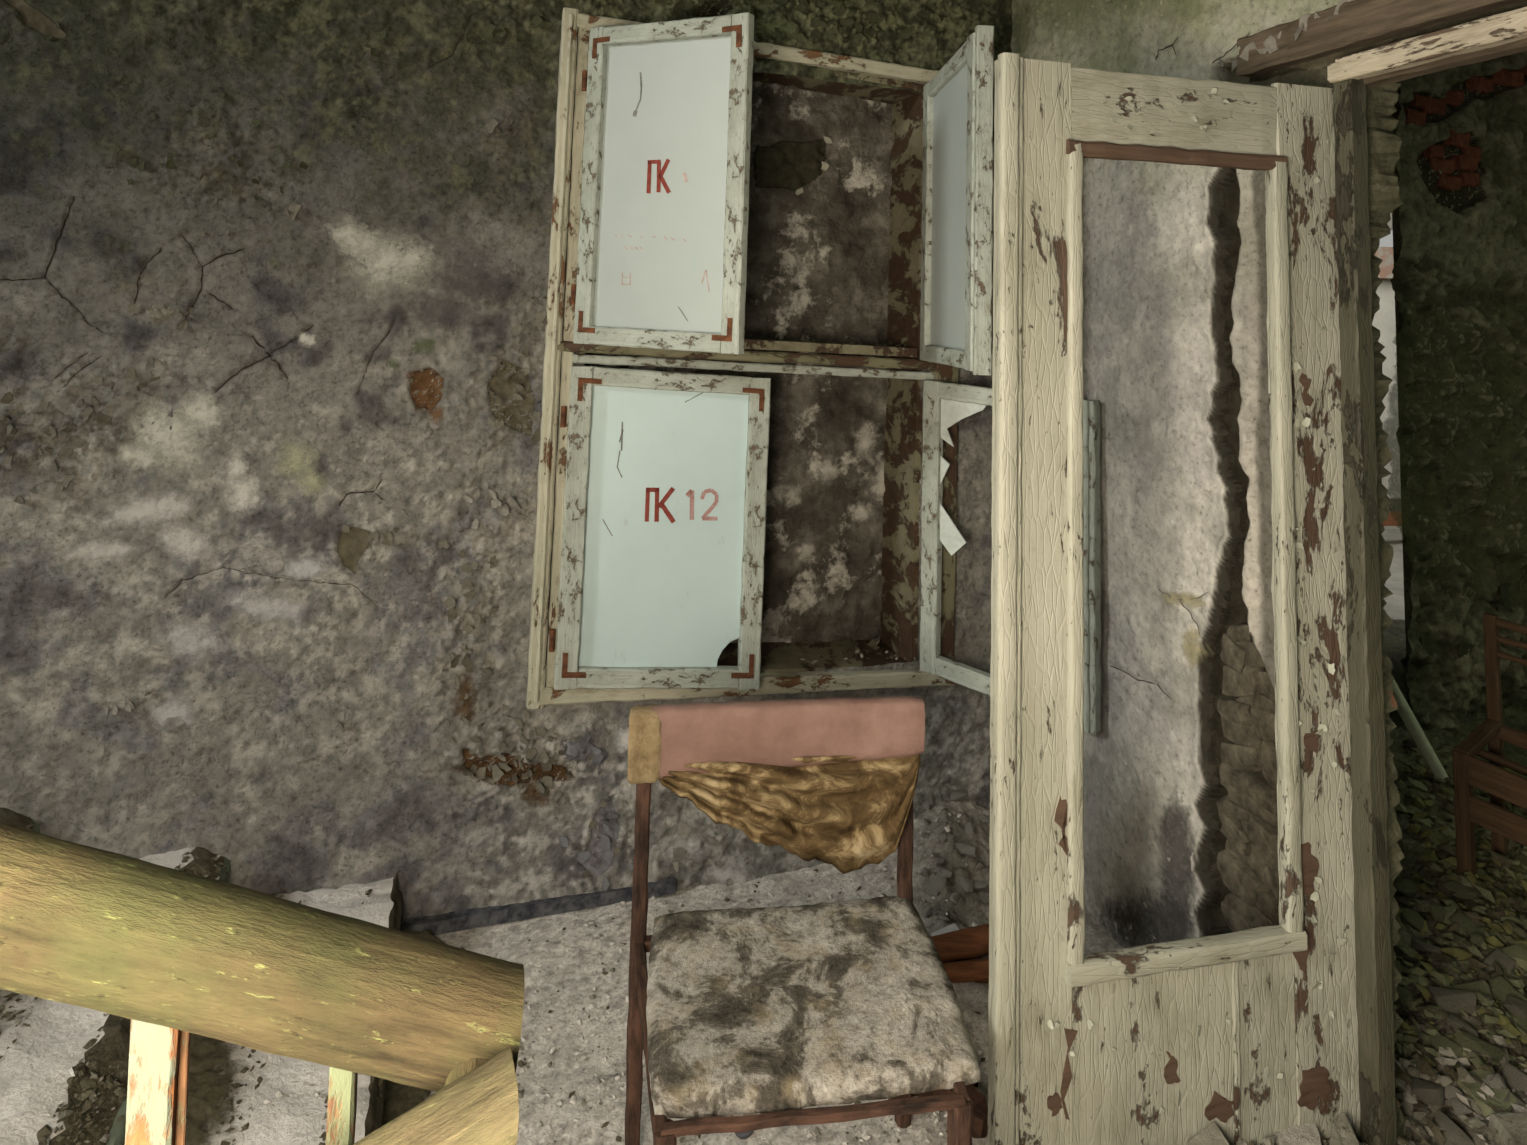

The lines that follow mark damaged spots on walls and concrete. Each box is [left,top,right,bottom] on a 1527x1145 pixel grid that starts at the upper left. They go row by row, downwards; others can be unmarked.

spalling [1217,0,1406,72]
crack [0,196,117,388]
crack [134,237,313,393]
crack [357,316,396,395]
peeling [1291,347,1314,427]
peeling [337,525,601,798]
peeling [1054,796,1068,856]
peeling [1292,842,1323,1005]
peeling [1047,1019,1094,1121]
peeling [1150,1051,1181,1114]
peeling [1204,1091,1235,1123]
peeling [1297,1066,1331,1110]